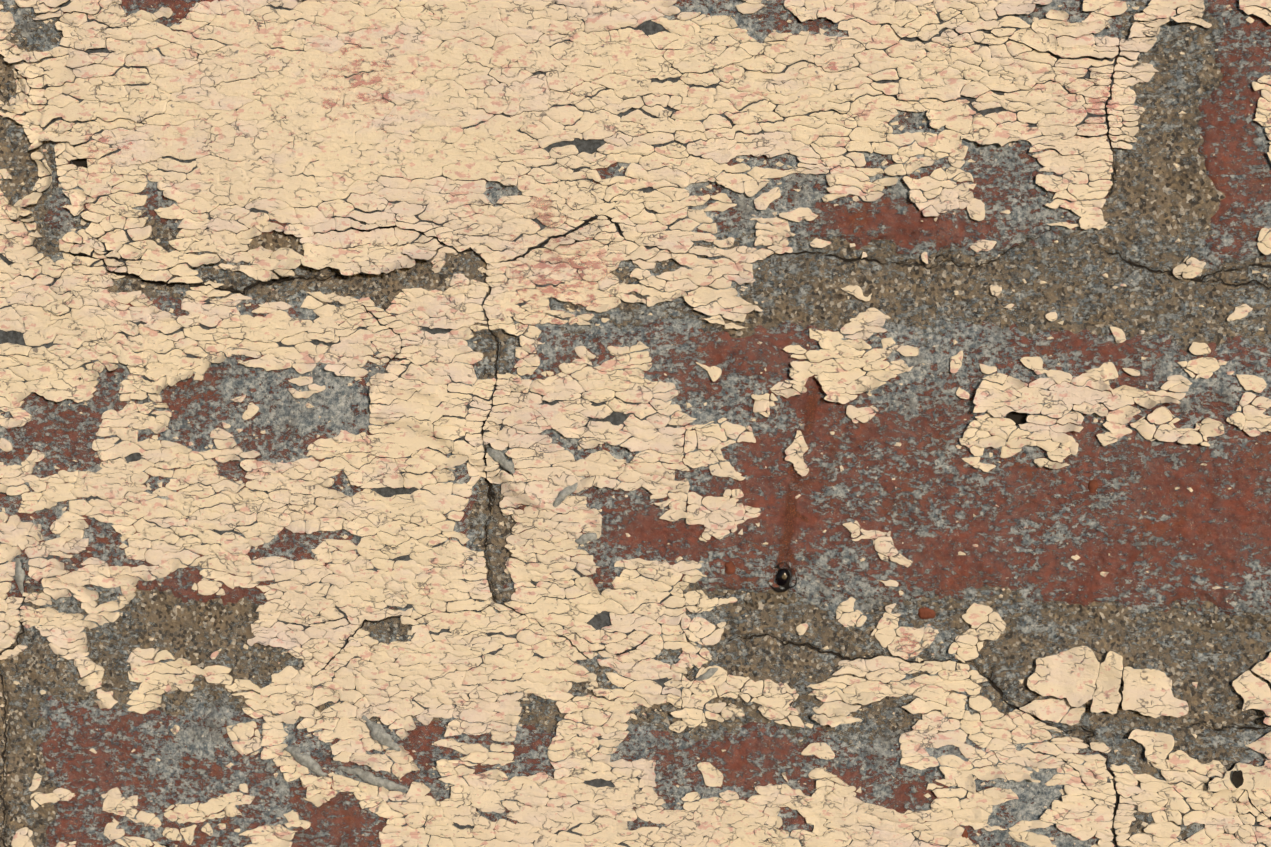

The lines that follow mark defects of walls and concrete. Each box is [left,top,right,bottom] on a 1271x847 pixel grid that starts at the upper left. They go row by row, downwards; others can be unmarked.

peeling [0,0,498,325]
crack [761,227,1052,269]
crack [1098,247,1271,289]
crack [0,581,26,847]
peeling [0,347,622,847]
crack [320,215,647,671]
rust [777,464,808,576]
peeling [442,0,1271,847]
crack [728,634,1120,847]